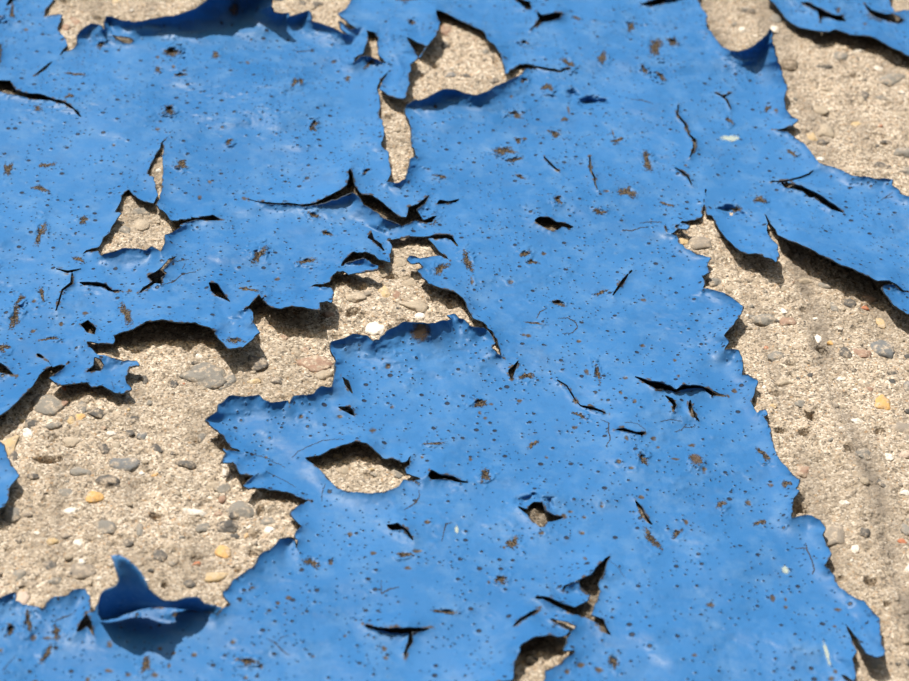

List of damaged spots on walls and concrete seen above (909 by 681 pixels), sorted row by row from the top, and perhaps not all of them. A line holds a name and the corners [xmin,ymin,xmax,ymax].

peeling [45,0,575,183]
peeling [648,38,679,56]
peeling [72,140,219,264]
peeling [665,0,909,681]
peeling [0,213,503,636]
crack [558,381,694,446]
peeling [513,619,575,681]